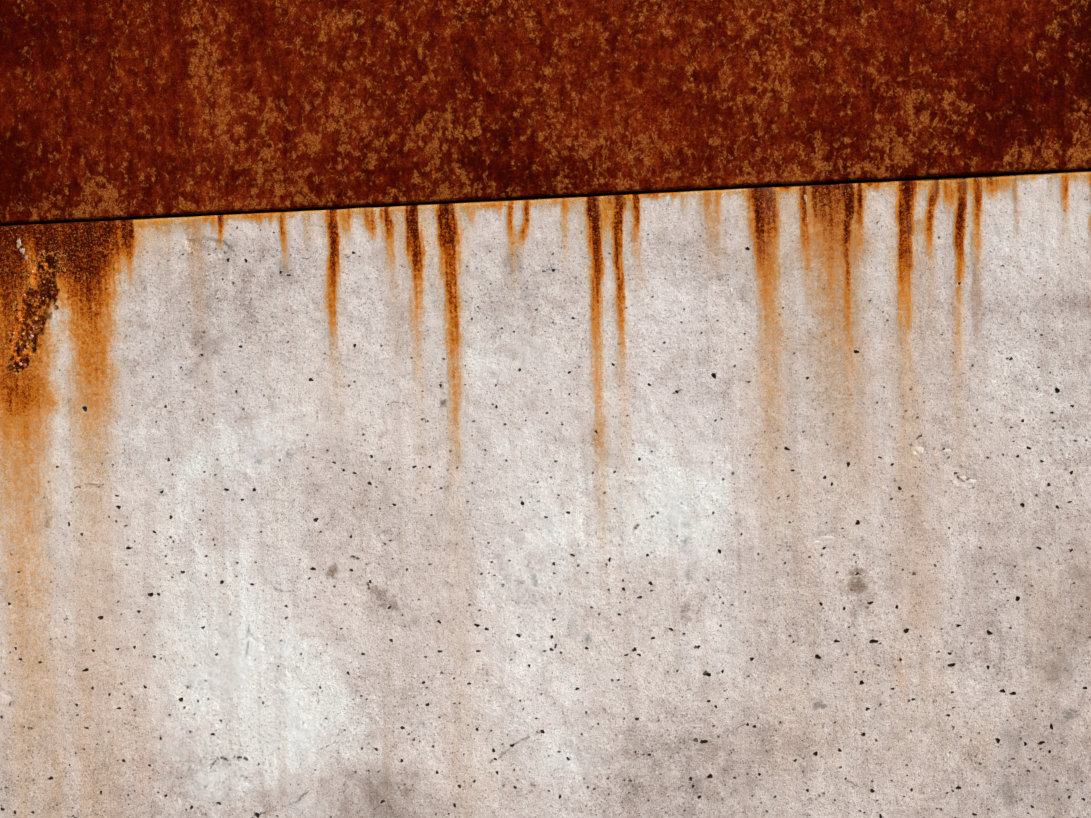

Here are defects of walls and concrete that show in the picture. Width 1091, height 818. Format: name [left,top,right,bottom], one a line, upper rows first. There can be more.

rust [0,171,1091,643]